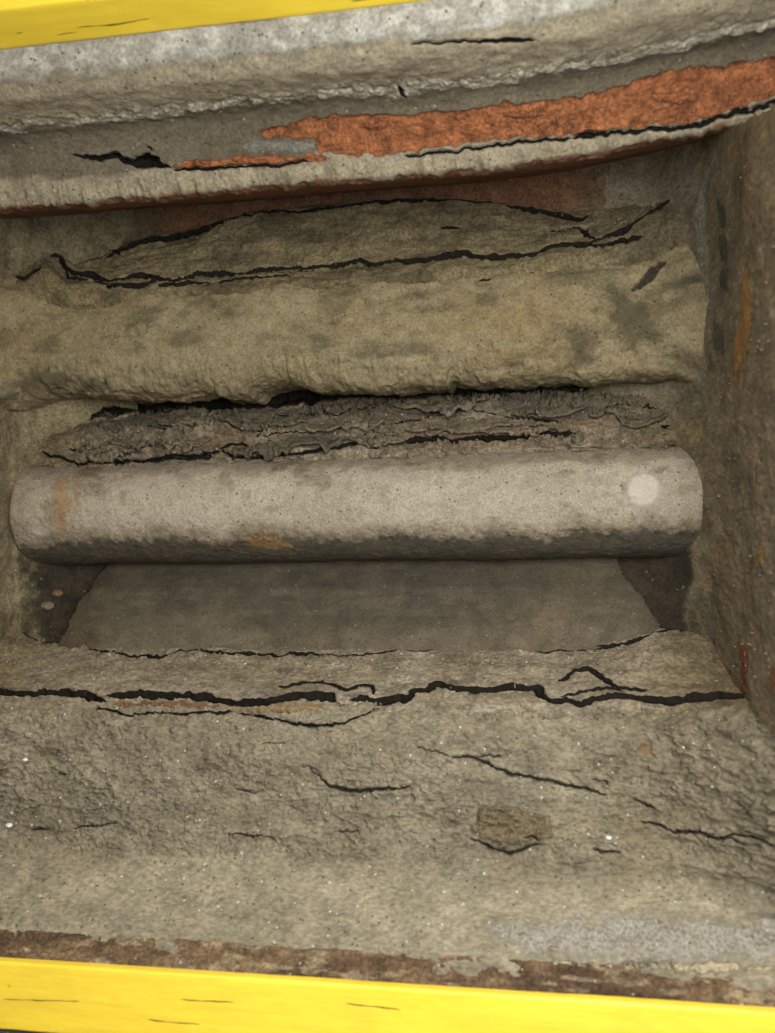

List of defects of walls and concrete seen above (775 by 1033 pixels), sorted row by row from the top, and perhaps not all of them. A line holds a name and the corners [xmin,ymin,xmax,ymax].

crack [405,100,775,157]
crack [73,146,308,171]
crack [15,198,670,289]
corrosion [733,256,752,382]
spalling [89,406,138,420]
crack [0,629,744,744]
crack [420,747,608,795]
crack [633,798,775,846]